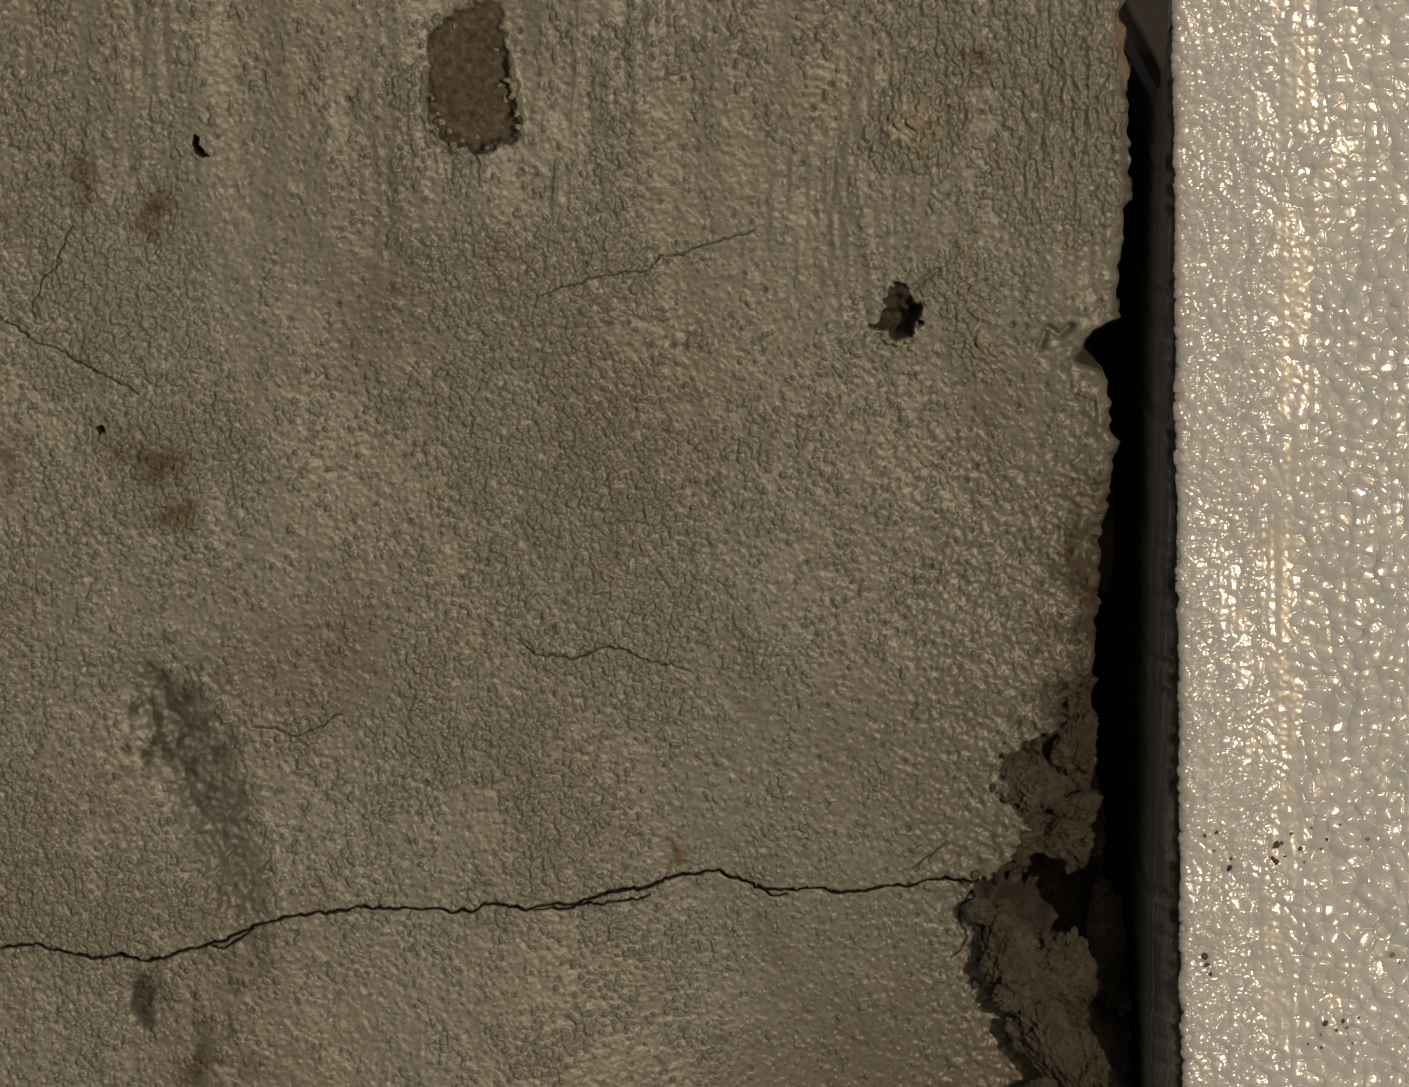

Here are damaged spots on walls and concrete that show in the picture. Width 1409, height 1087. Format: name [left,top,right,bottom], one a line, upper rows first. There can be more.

flaking render [426,0,523,155]
crack [0,869,978,962]
spalling [951,673,1133,1087]